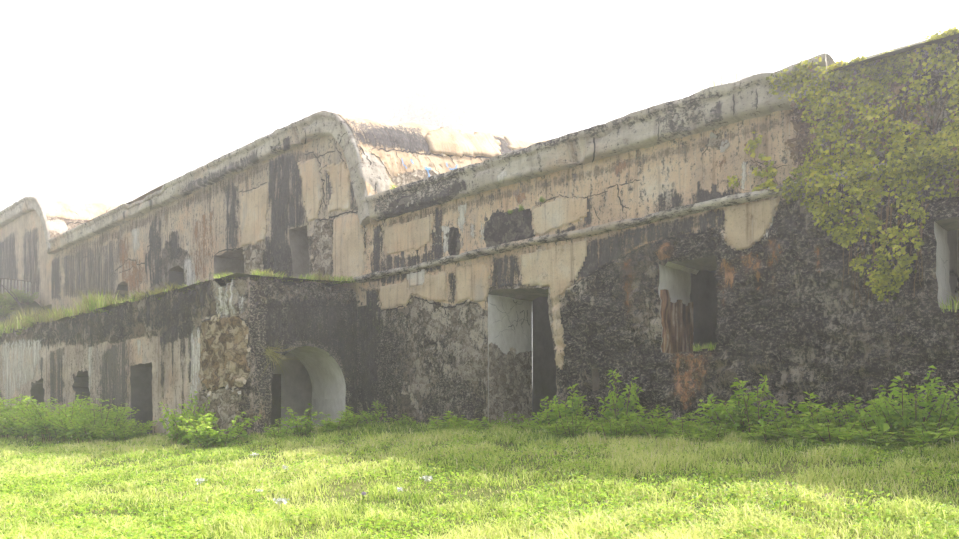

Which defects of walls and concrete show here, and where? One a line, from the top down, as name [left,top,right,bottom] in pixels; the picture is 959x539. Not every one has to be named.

water stain [0,136,318,419]
water stain [357,127,430,153]
water stain [264,136,709,418]
flaking render [483,195,589,370]
crack [536,179,639,220]
water stain [573,161,747,285]
flaking render [724,197,780,250]
spalling [194,313,251,432]
flaking render [489,342,532,427]
corrosion [672,352,711,410]